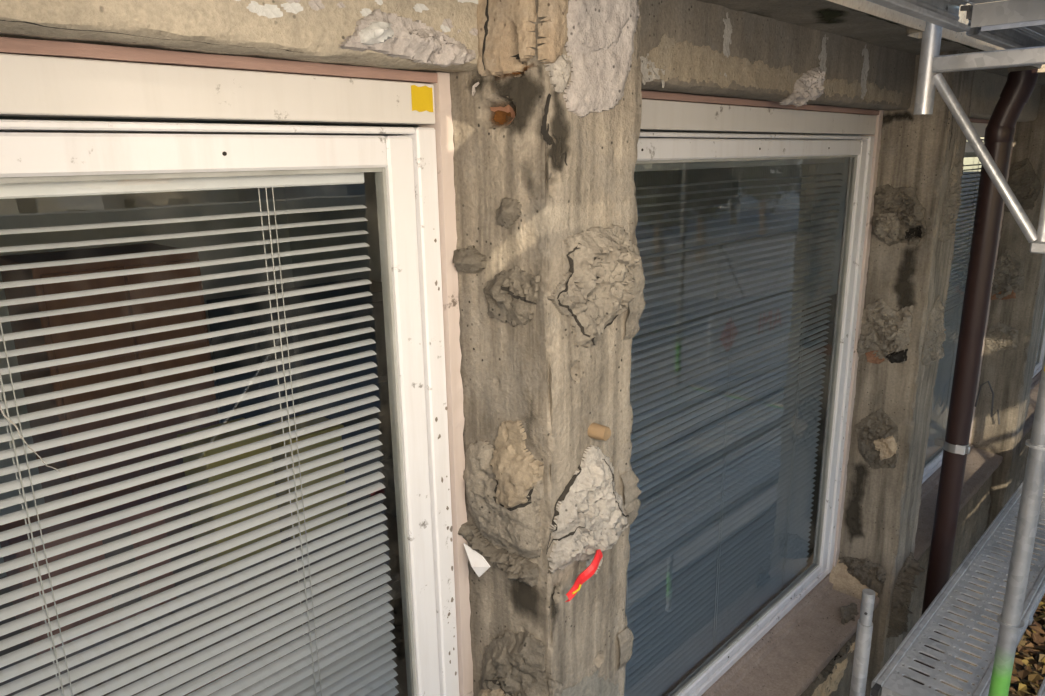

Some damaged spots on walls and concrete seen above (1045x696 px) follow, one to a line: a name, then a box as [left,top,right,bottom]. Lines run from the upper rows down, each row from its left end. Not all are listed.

peeling [235,0,345,18]
spalling [338,0,569,77]
peeling [647,34,909,107]
corrosion [490,104,517,127]